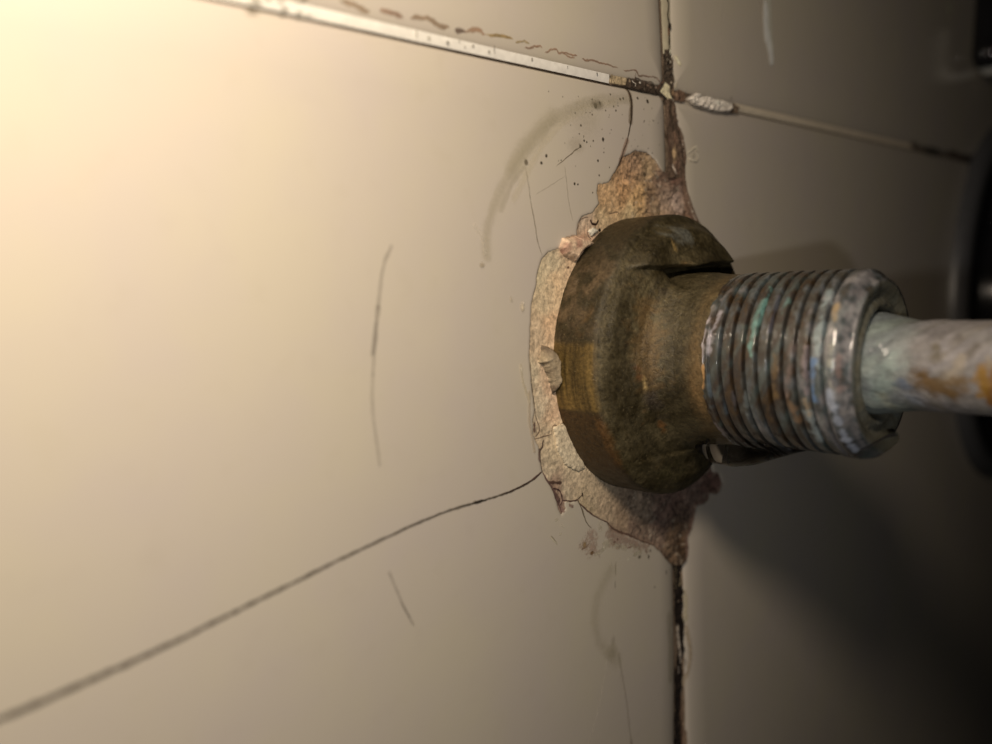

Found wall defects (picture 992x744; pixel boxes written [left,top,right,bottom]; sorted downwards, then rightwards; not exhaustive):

rust [340,0,613,67]
flaking render [529,131,722,565]
crack [0,472,542,721]